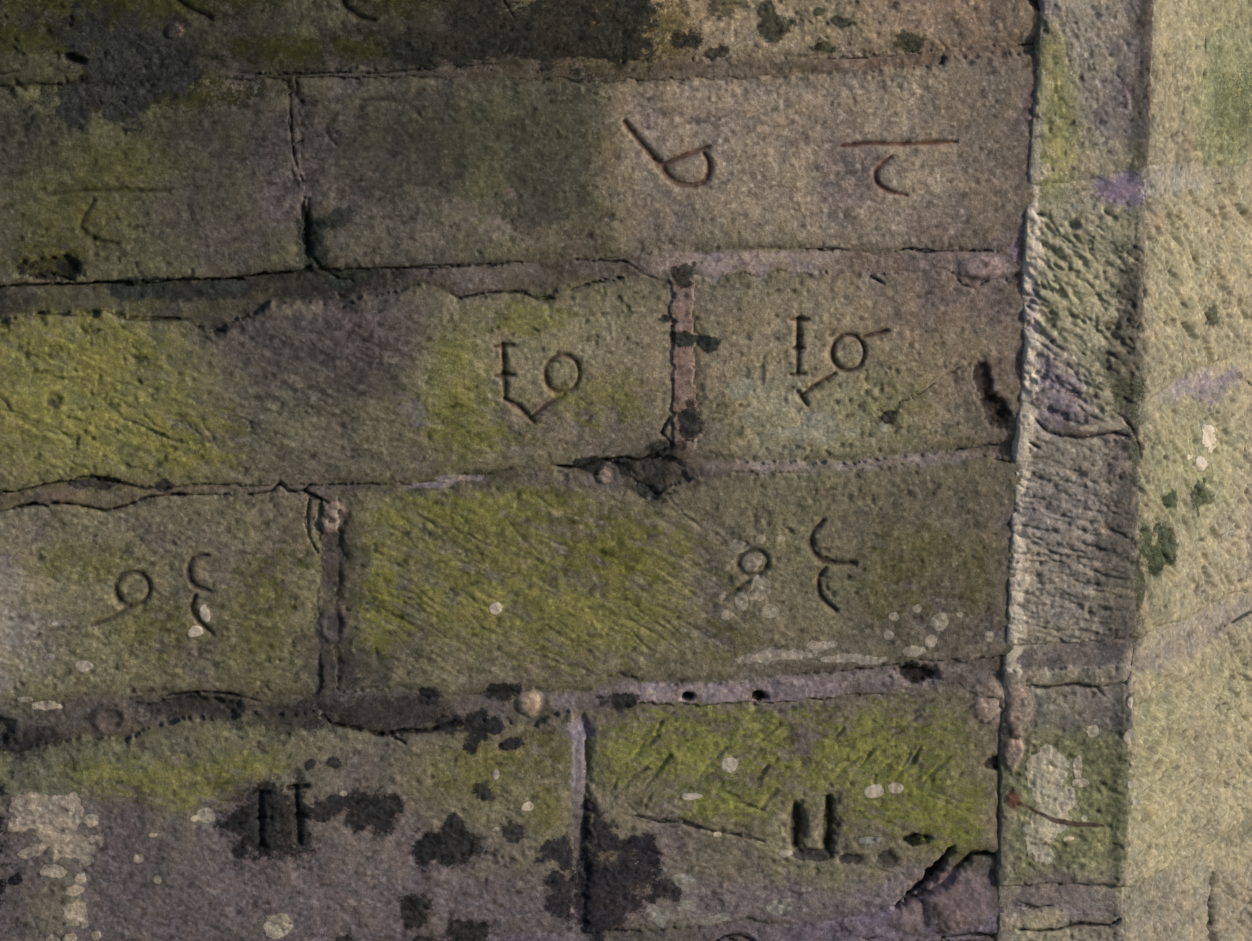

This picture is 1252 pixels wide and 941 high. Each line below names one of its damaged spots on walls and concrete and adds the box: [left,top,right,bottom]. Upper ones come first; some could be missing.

damp [187,0,452,70]
damp [145,78,295,115]
spalling [973,361,1011,429]
damp [139,691,452,735]
crack [896,846,994,904]